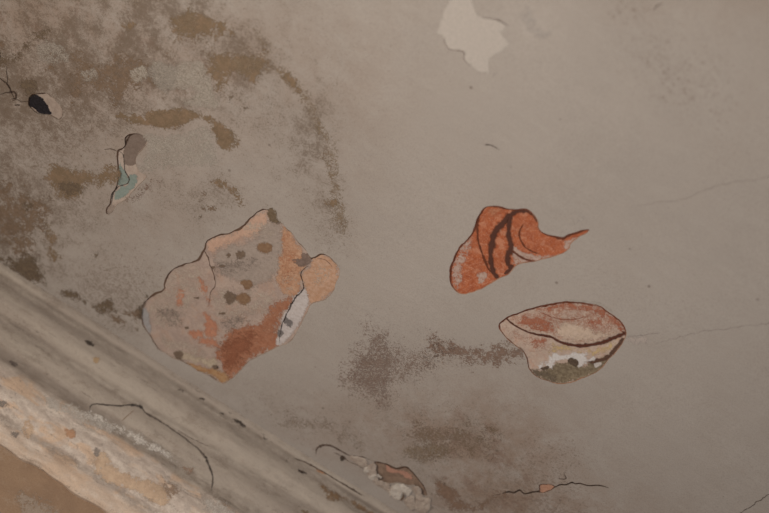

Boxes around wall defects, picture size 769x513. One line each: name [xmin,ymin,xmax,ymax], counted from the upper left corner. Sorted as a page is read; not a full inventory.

crack [0,52,28,106]
flaking render [28,93,63,120]
damp [44,48,240,152]
damp [165,5,352,237]
damp [0,160,122,286]
flaking render [449,206,589,294]
flaking render [136,208,340,384]
damp [332,308,527,414]
flaking render [498,299,627,384]
crack [89,403,213,490]
flaking render [316,444,431,513]
crack [497,474,608,495]